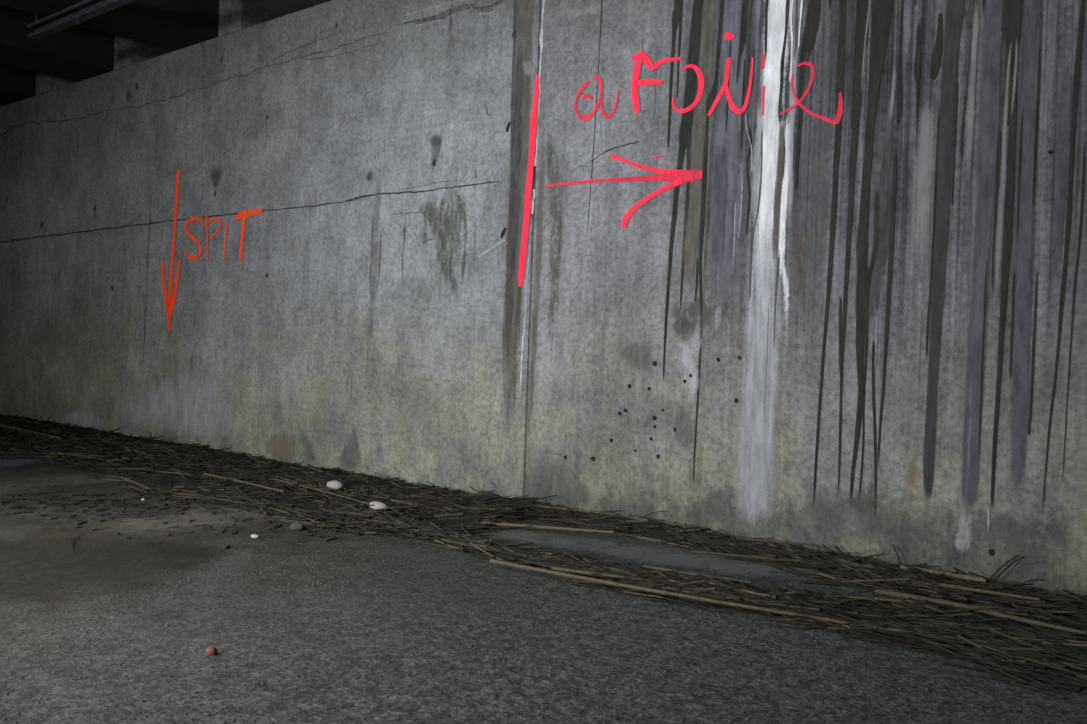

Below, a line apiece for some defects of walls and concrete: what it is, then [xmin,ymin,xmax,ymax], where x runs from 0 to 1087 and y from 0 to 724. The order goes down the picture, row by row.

crack [0,181,497,270]
leakage [423,196,467,290]
leakage [502,0,532,412]
leakage [529,145,561,404]
leakage [629,0,1085,548]